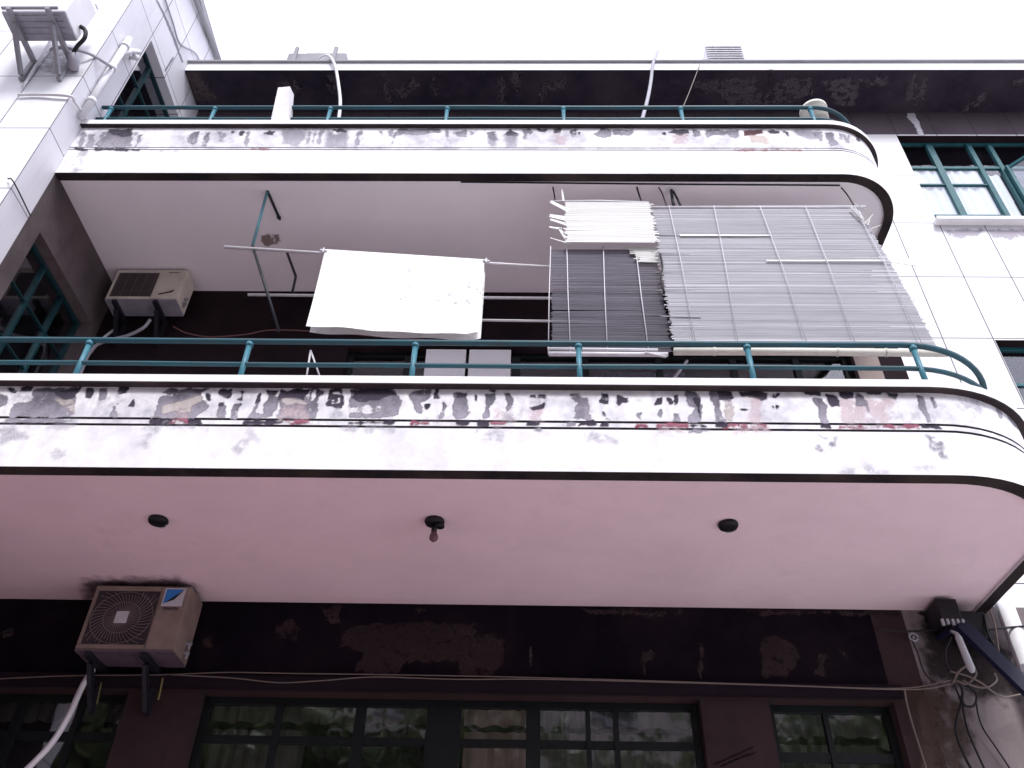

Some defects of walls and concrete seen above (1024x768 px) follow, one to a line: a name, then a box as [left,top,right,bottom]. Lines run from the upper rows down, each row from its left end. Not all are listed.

peeling [74,129,142,151]
peeling [188,131,269,150]
peeling [265,129,362,148]
peeling [663,129,860,146]
peeling [0,386,130,423]
peeling [149,388,514,429]
peeling [527,394,546,431]
peeling [567,394,628,426]
peeling [654,391,780,433]
peeling [804,392,898,429]
peeling [916,395,942,429]
spalling [746,608,898,617]